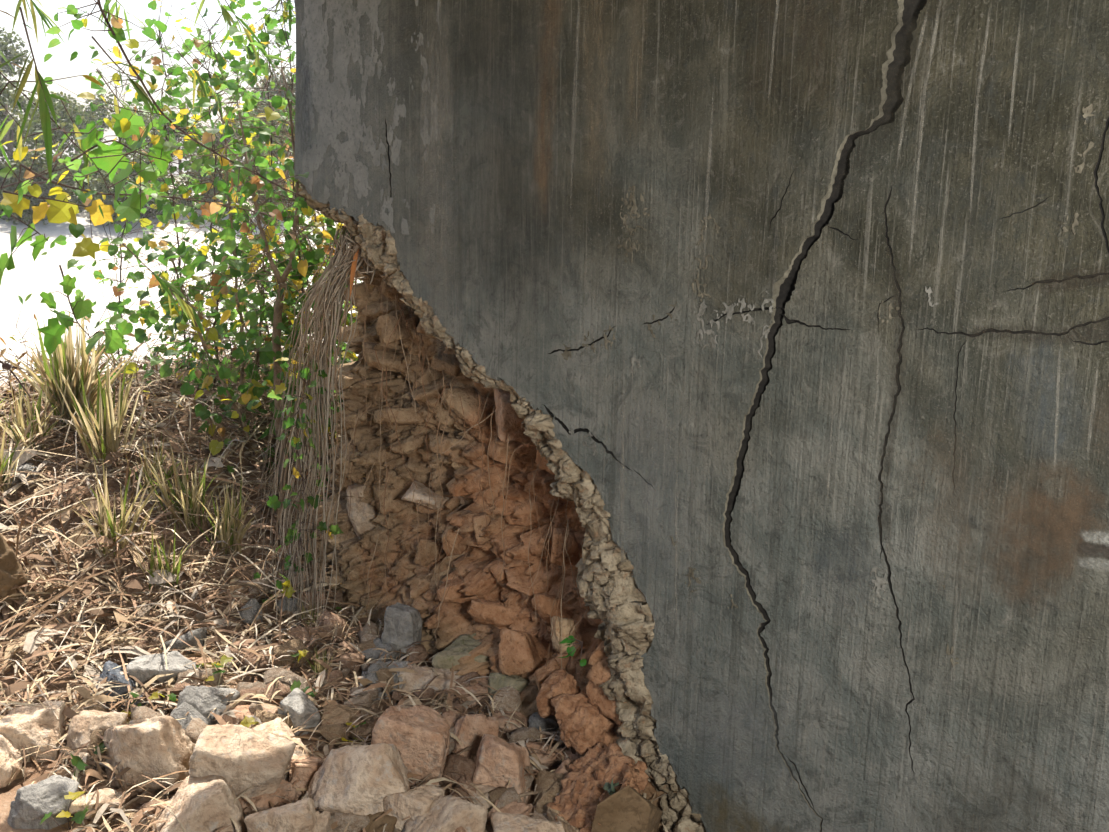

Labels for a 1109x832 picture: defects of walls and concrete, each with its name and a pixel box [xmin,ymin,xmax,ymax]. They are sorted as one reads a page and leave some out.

crack [1005,117,1109,292]
spalling [298,0,706,832]
crack [548,325,617,354]
crack [544,405,656,491]
crack [644,307,675,324]
crack [707,0,927,832]
crack [877,184,1109,772]